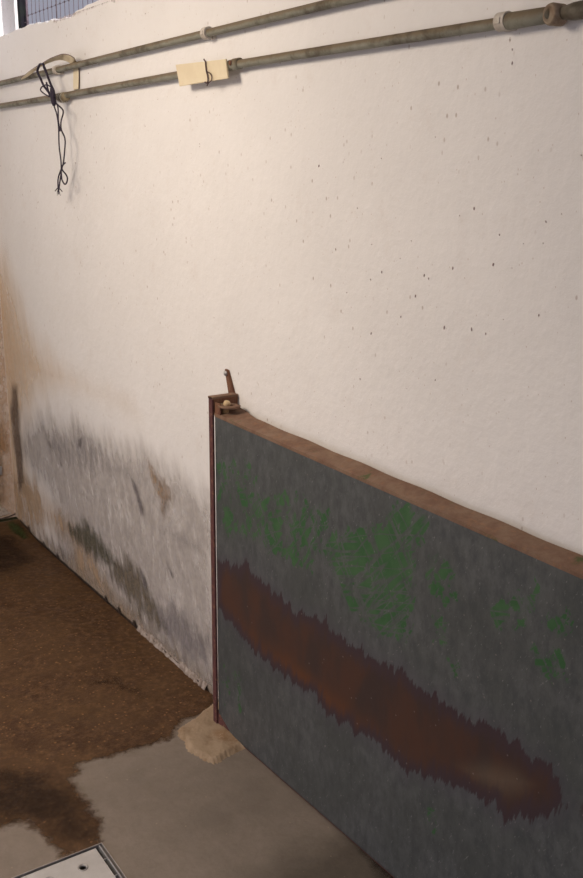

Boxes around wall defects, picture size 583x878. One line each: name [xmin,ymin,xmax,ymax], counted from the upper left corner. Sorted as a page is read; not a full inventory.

water stain [0,389,219,857]